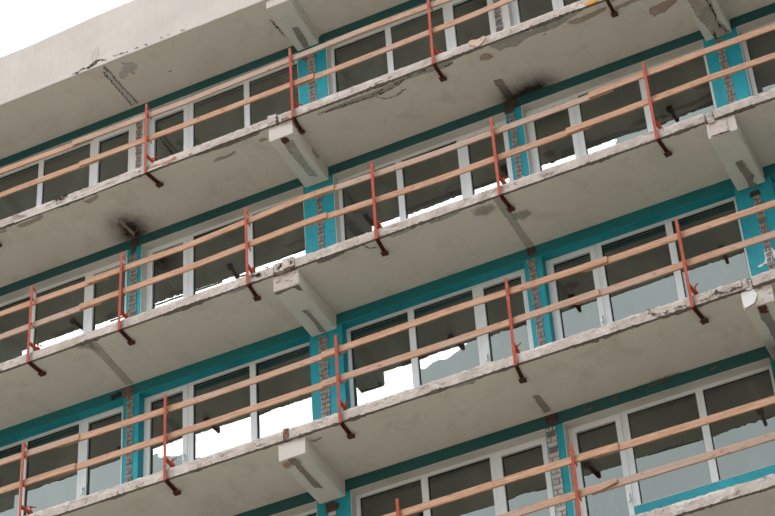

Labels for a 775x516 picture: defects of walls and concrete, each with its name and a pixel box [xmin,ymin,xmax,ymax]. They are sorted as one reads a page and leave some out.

crack [73,59,137,106]
crack [318,63,453,115]
flaking render [736,160,775,270]